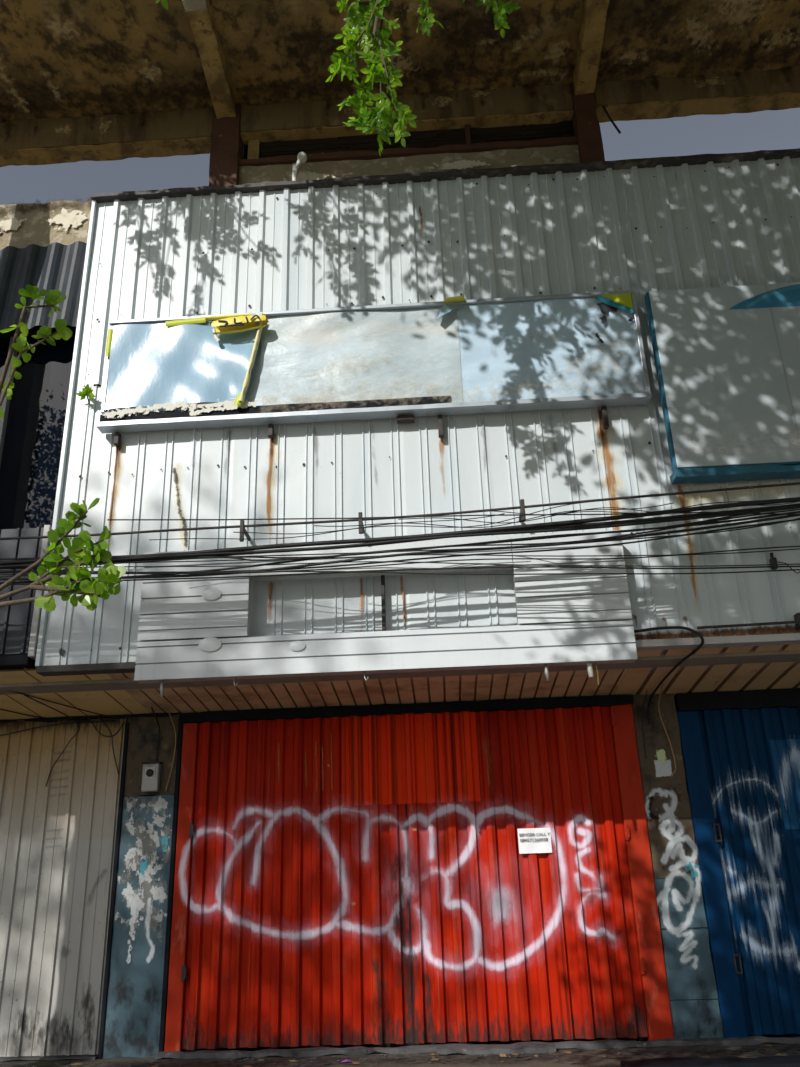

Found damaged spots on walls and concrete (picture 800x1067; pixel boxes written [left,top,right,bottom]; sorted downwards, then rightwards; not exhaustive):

water stain [0,29,212,141]
water stain [235,0,576,115]
water stain [596,0,800,91]
peeling [0,216,27,233]
peeling [46,208,87,231]
corrosion [108,441,122,526]
corrosion [266,435,276,543]
corrosion [597,410,620,530]
corrosion [678,485,697,598]